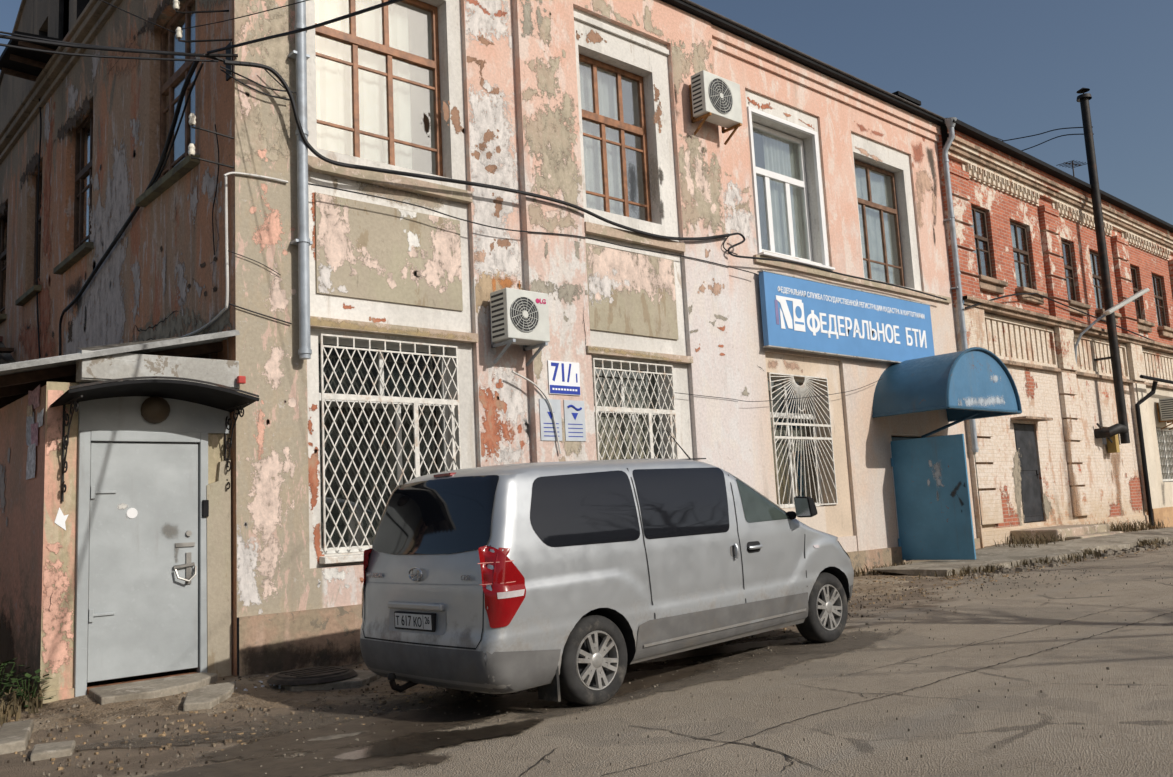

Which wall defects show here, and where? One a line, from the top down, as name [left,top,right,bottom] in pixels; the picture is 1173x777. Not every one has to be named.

peeling [467,56,502,97]
peeling [466,0,507,20]
peeling [576,29,607,43]
peeling [471,129,501,174]
peeling [507,0,601,259]
peeling [357,182,443,233]
peeling [492,193,503,218]
peeling [678,134,755,258]
peeling [474,238,630,326]
peeling [479,374,530,465]
peeling [281,397,325,564]
leakage [0,614,31,699]